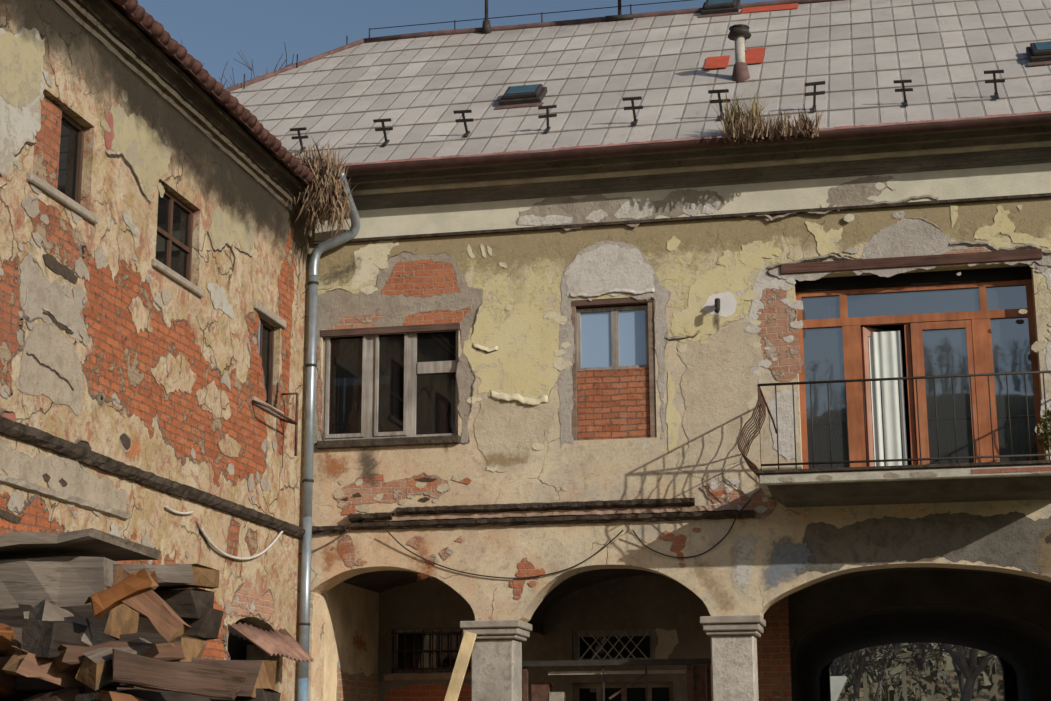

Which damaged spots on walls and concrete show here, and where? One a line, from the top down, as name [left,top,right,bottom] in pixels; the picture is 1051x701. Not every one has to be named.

peeling [0,28,53,175]
crack [106,150,151,203]
peeling [101,90,172,202]
crack [950,240,1051,255]
flaking render [0,183,298,503]
flaking render [314,174,1051,462]
flaking render [0,482,69,534]
flaking render [225,517,258,566]
flaking render [331,472,472,569]
flaking render [510,557,546,599]
flaking render [699,452,776,520]
flaking render [200,579,275,660]